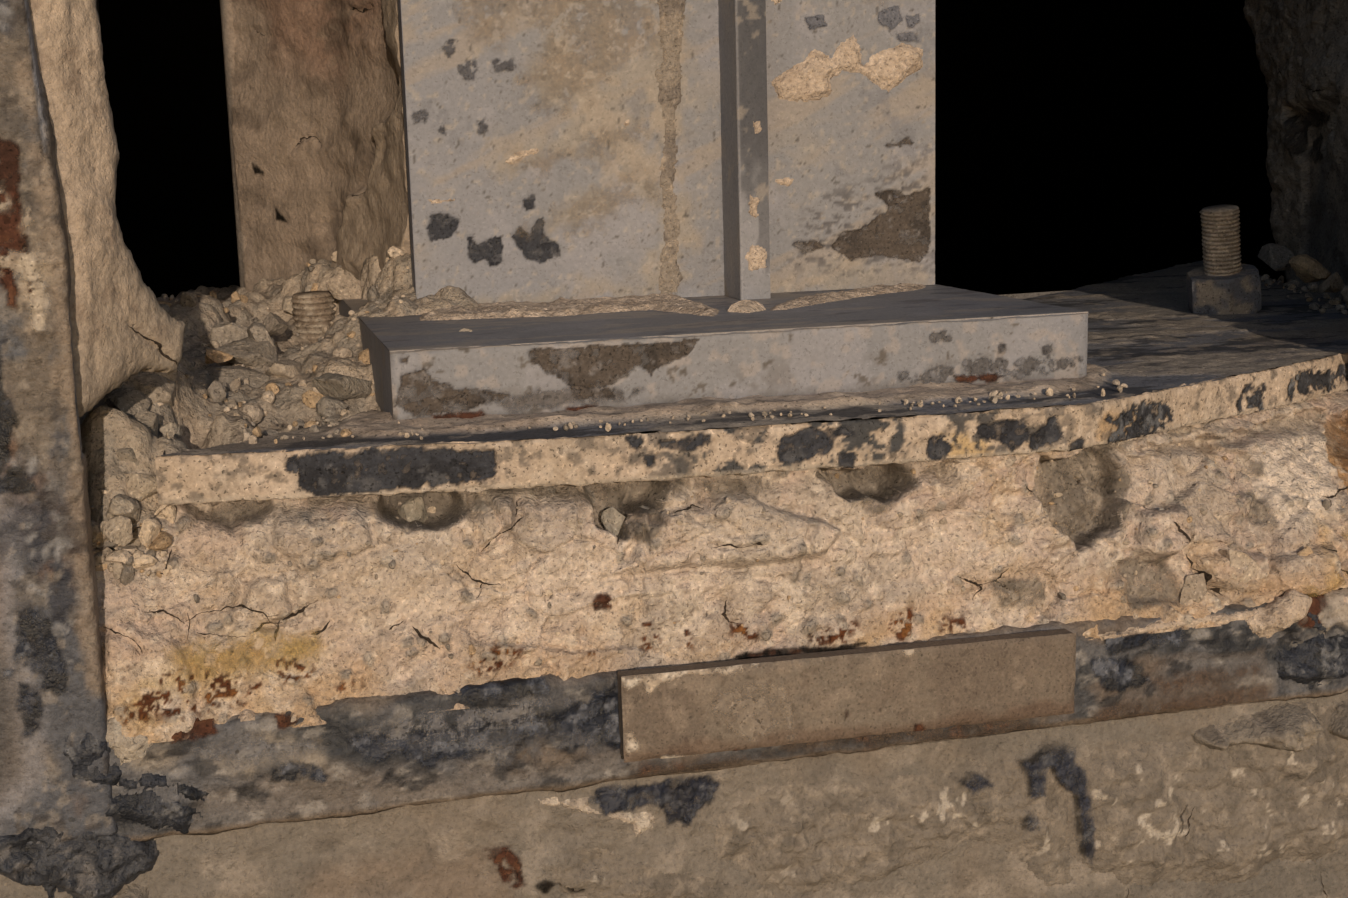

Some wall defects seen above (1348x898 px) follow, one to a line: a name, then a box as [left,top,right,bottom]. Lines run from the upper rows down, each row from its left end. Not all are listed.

rust [0,139,33,307]
peeling [793,188,931,262]
peeling [286,446,497,529]
spalling [605,432,711,542]
crack [457,502,522,598]
crack [105,600,330,652]
rust [276,660,313,682]
crack [389,621,440,649]
peeling [1104,627,1185,656]
rust [124,672,262,742]
rust [275,714,298,729]
rust [490,847,523,888]